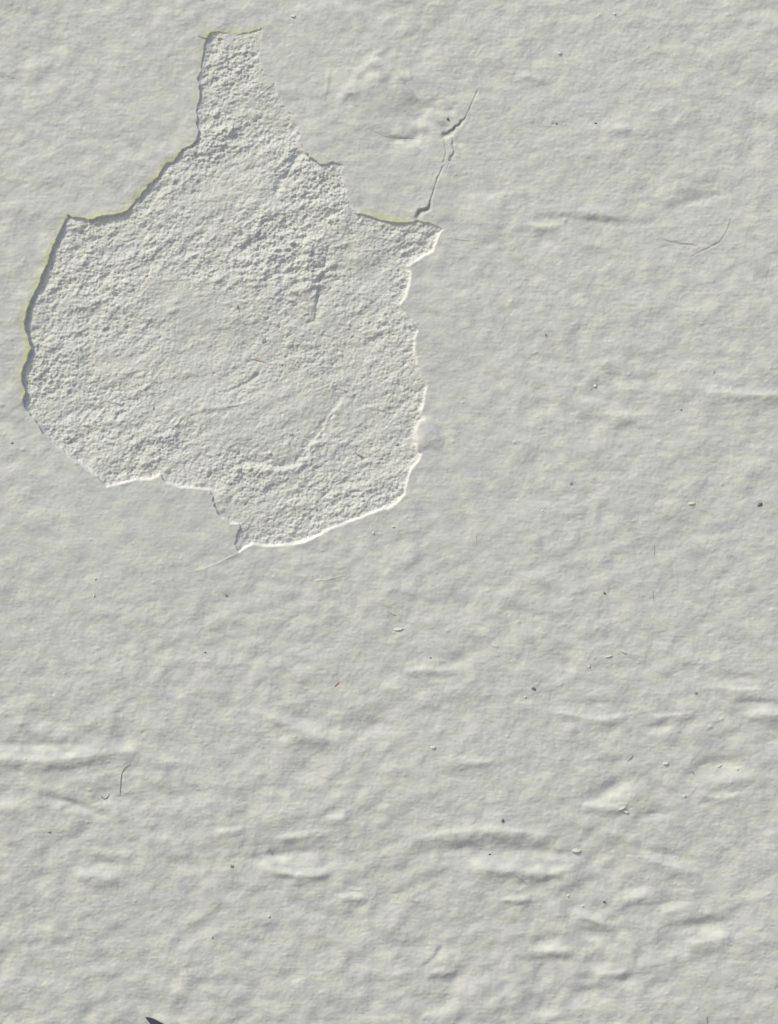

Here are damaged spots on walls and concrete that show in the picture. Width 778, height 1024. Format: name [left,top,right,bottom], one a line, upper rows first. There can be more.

peeling [8,15,452,554]
crack [371,42,486,210]